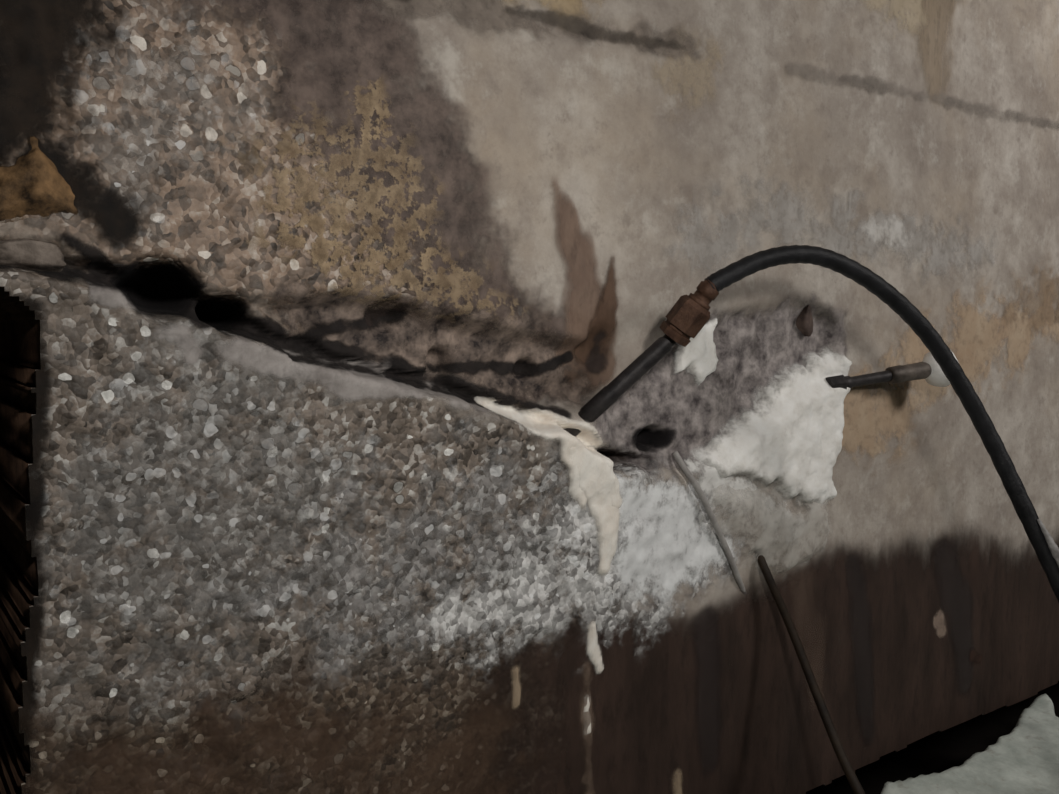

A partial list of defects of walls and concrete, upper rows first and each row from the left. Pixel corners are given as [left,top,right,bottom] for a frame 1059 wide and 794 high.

crack [0,233,127,289]
leakage [189,0,590,405]
crack [164,296,573,419]
efflorescence [675,318,718,385]
leakage [246,569,304,613]
leakage [306,350,1059,794]